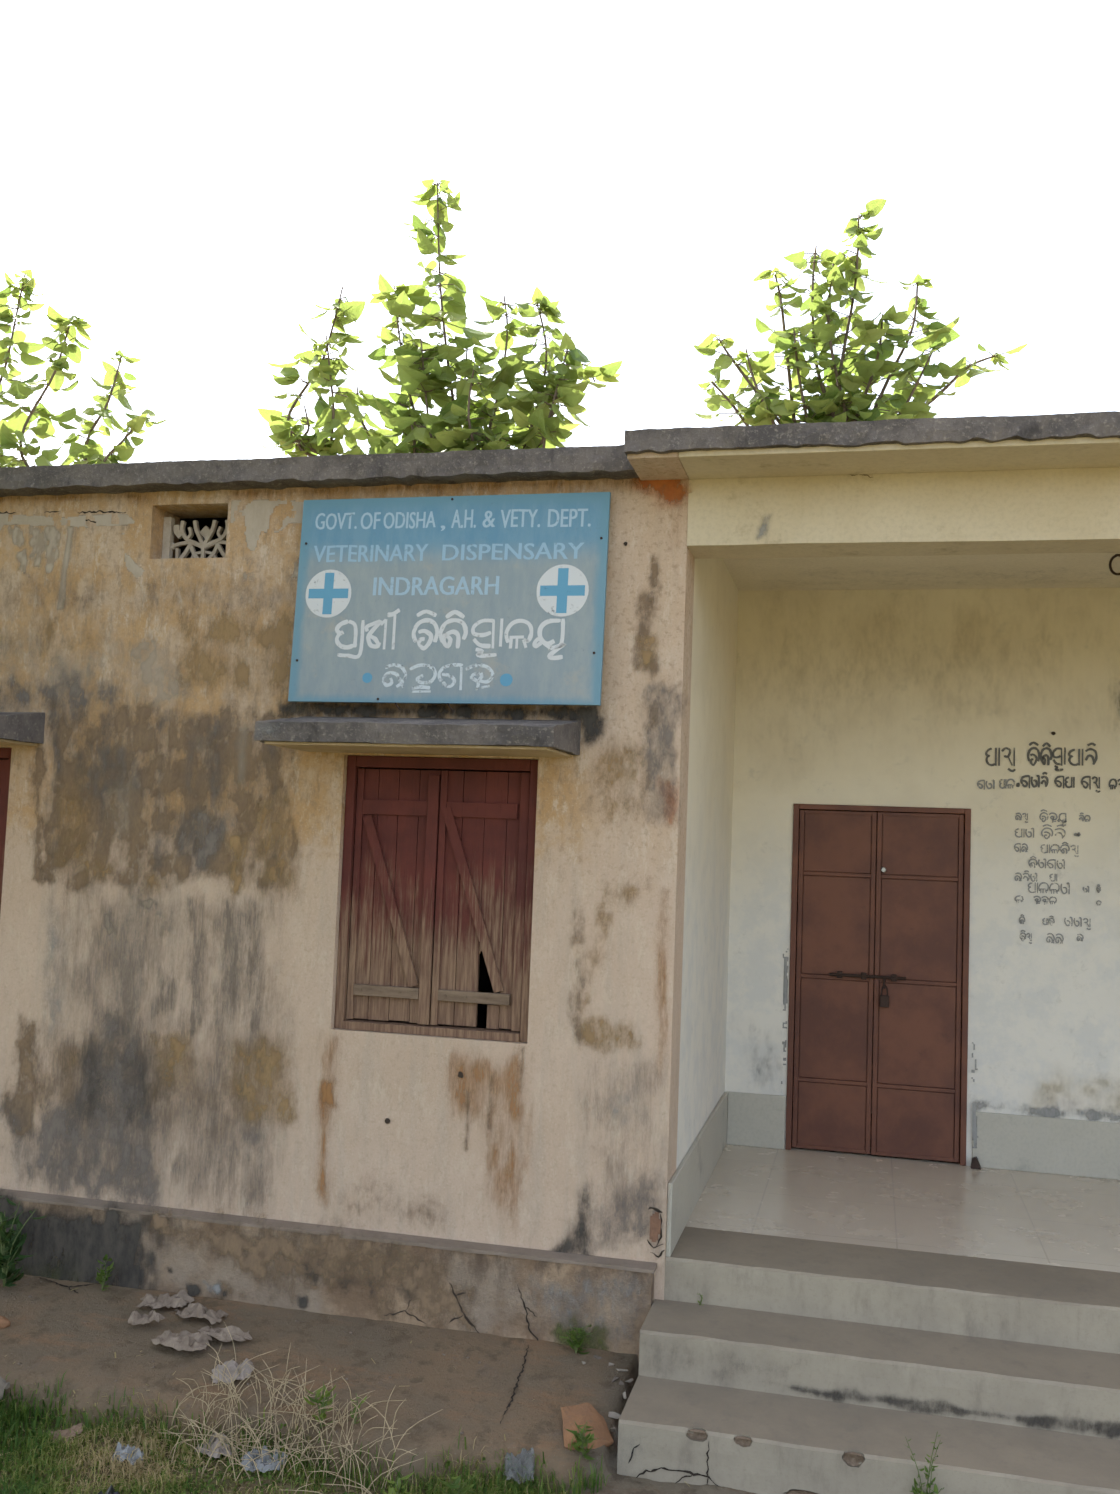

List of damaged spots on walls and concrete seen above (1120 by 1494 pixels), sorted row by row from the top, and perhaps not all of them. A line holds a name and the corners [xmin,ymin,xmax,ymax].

water stain [636,557,678,814]
water stain [10,674,604,983]
water stain [0,947,474,1331]
corrosion [318,1081,334,1193]
corrosion [451,1060,520,1148]
water stain [1029,1107,1120,1121]
crack [384,1283,479,1333]
water stain [793,1387,984,1415]
water stain [1016,1416,1120,1438]